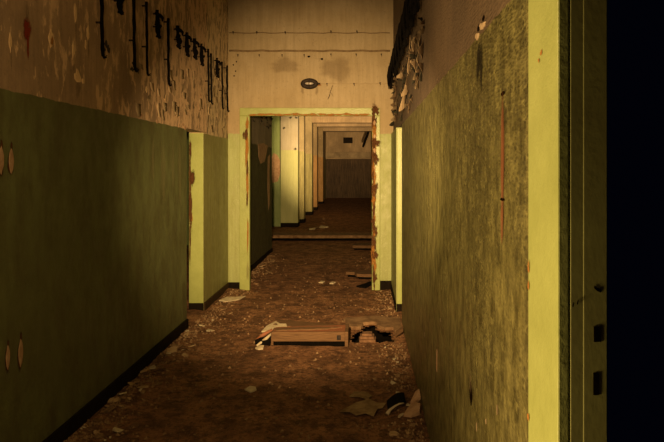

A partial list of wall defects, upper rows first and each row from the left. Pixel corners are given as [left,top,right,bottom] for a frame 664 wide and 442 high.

peeling [135,64,226,136]
peeling [389,17,424,127]
peeling [0,140,14,176]
corrosion [243,106,380,290]